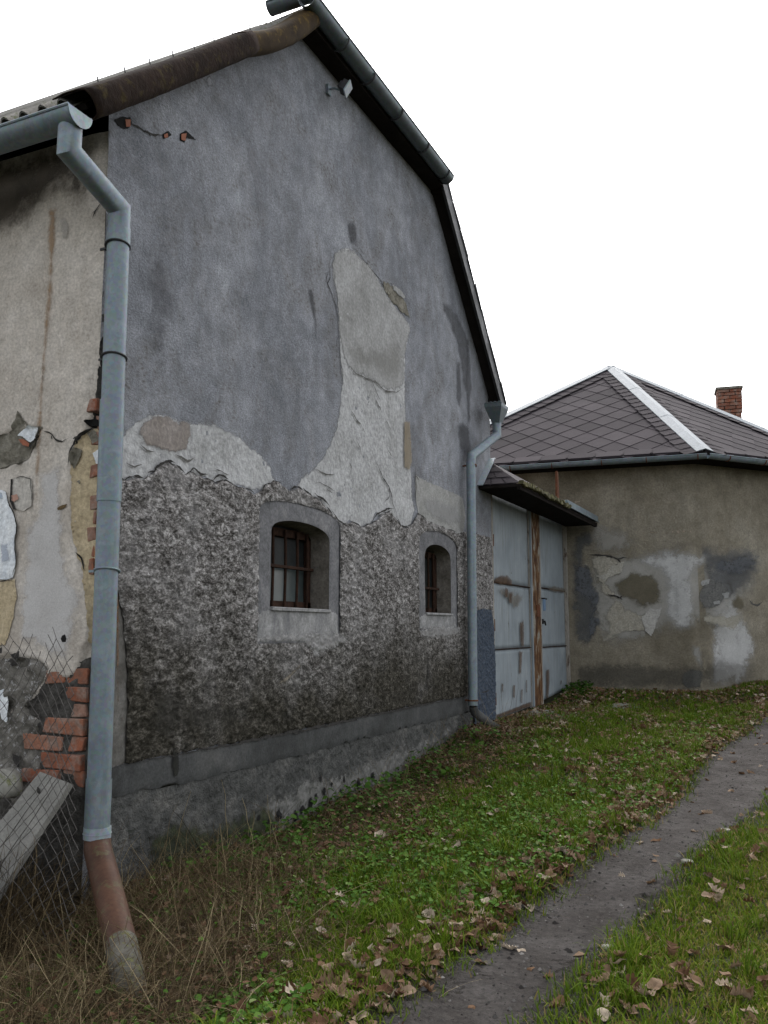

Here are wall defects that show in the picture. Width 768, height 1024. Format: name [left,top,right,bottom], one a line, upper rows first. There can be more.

corrosion [45,211,55,332]
spalling [0,411,42,468]
spalling [57,314,104,643]
spalling [122,248,466,534]
crack [591,554,626,563]
flaking render [591,556,662,641]
leakage [573,527,757,688]
spalling [0,490,91,916]